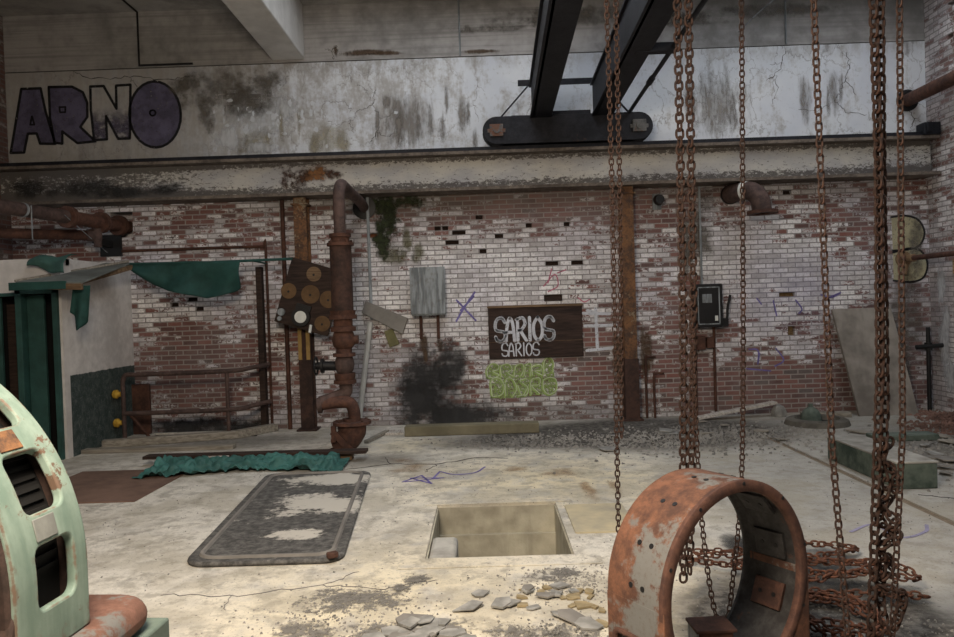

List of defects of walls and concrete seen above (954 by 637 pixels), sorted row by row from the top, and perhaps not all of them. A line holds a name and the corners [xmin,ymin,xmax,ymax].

damp [170,74,295,152]
damp [376,97,444,143]
damp [445,89,470,129]
damp [686,79,737,127]
damp [800,78,808,115]
damp [827,78,842,109]
corrosion [281,165,341,191]